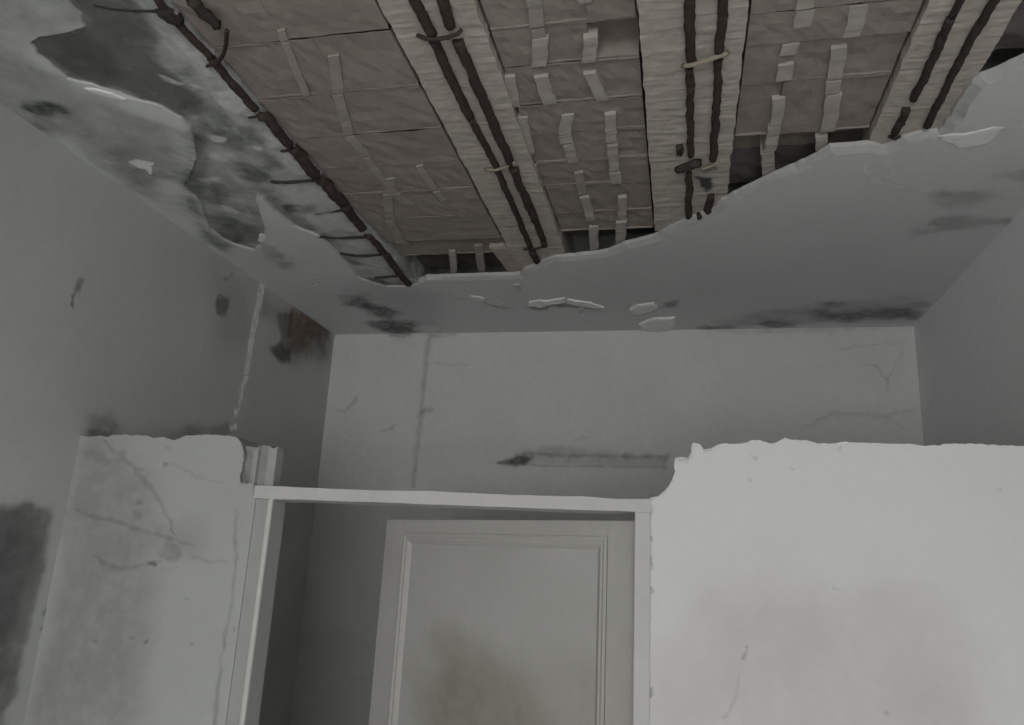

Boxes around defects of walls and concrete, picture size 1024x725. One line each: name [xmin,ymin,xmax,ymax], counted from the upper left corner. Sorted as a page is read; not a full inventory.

damp [24,102,66,114]
flaking render [30,0,1024,292]
flaking render [529,297,604,313]